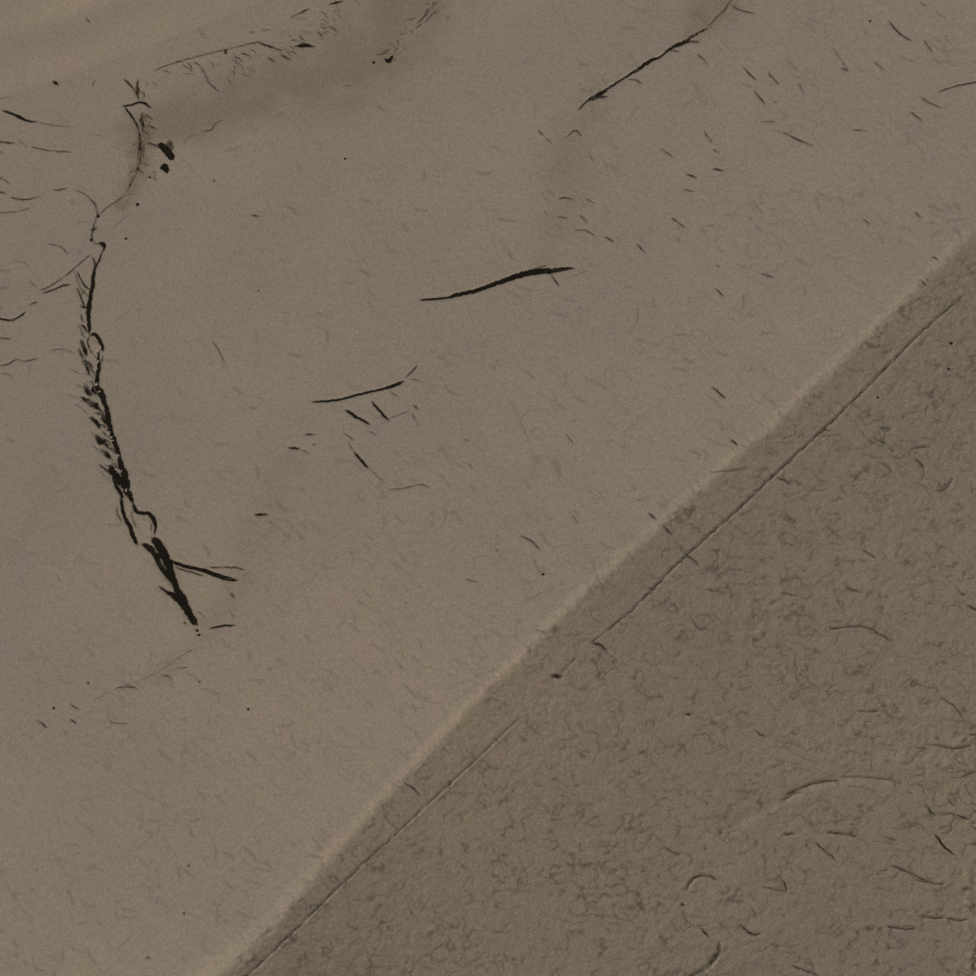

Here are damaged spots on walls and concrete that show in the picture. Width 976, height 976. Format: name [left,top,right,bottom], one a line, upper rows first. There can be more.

crack [3,110,35,122]
crack [123,80,174,206]
crack [571,29,706,133]
crack [421,267,573,301]
crack [45,201,242,636]
crack [314,368,415,424]